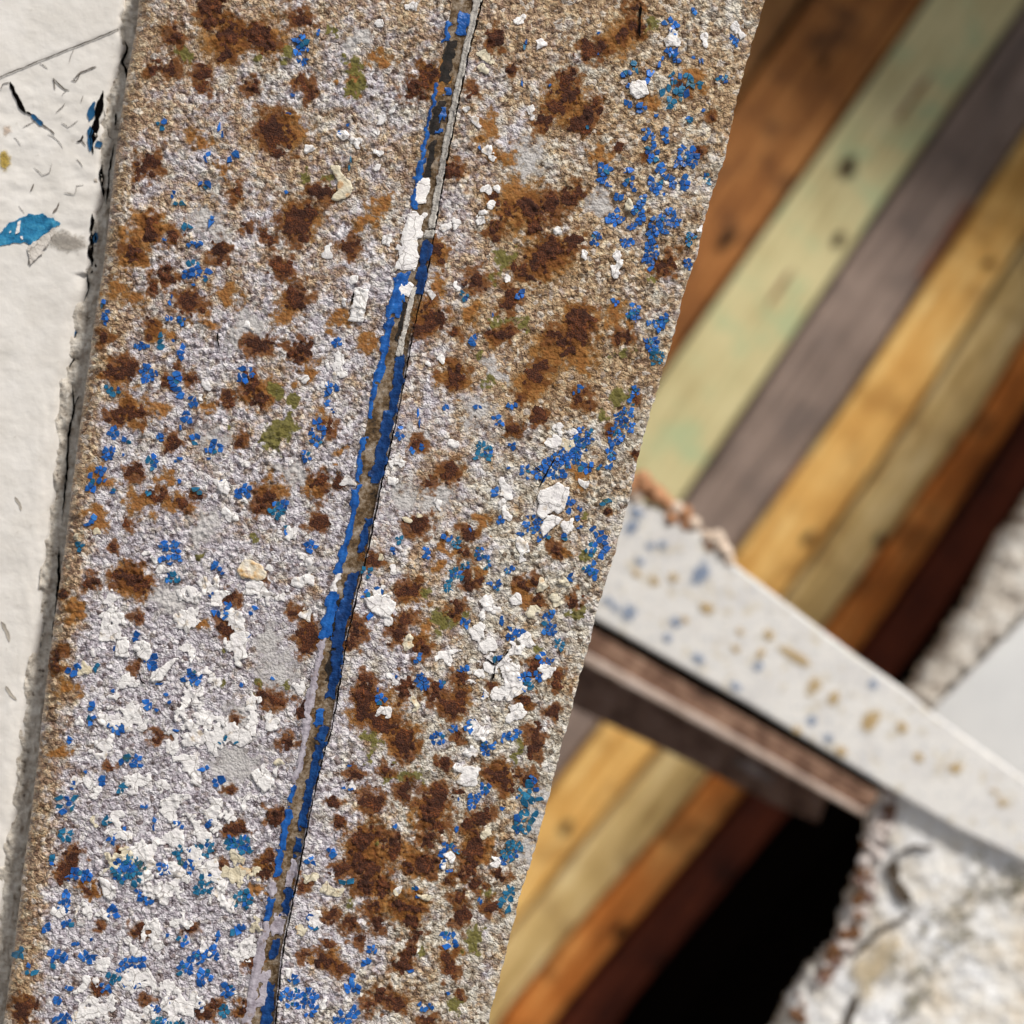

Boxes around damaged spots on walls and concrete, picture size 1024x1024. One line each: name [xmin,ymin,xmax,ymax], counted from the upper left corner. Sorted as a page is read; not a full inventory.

peeling [0,213,60,264]
crack [0,28,128,300]
rust [183,127,215,151]
rust [193,159,383,415]
rust [396,58,638,440]
crack [40,553,61,647]
crack [61,330,79,525]
rust [57,459,206,630]
peeling [11,0,497,1024]
crack [275,0,483,1024]
rust [46,744,75,758]
rust [293,510,572,1024]